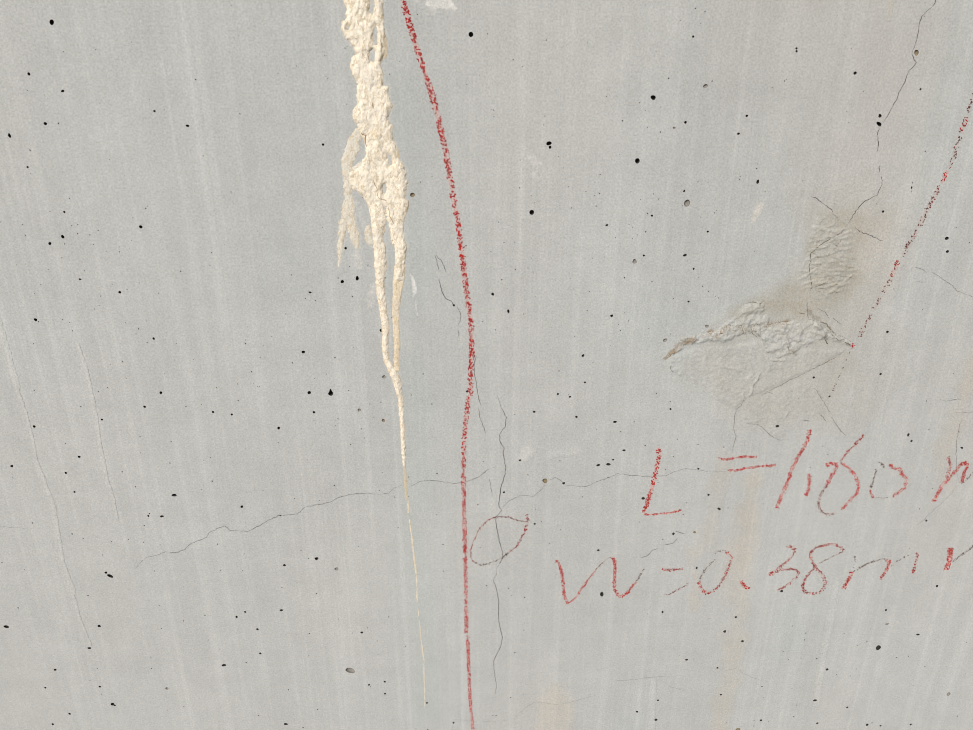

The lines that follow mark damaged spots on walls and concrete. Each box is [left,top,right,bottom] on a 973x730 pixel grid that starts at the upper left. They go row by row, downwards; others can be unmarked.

efflorescence [412,0,457,18]
crack [809,0,936,284]
efflorescence [334,0,425,707]